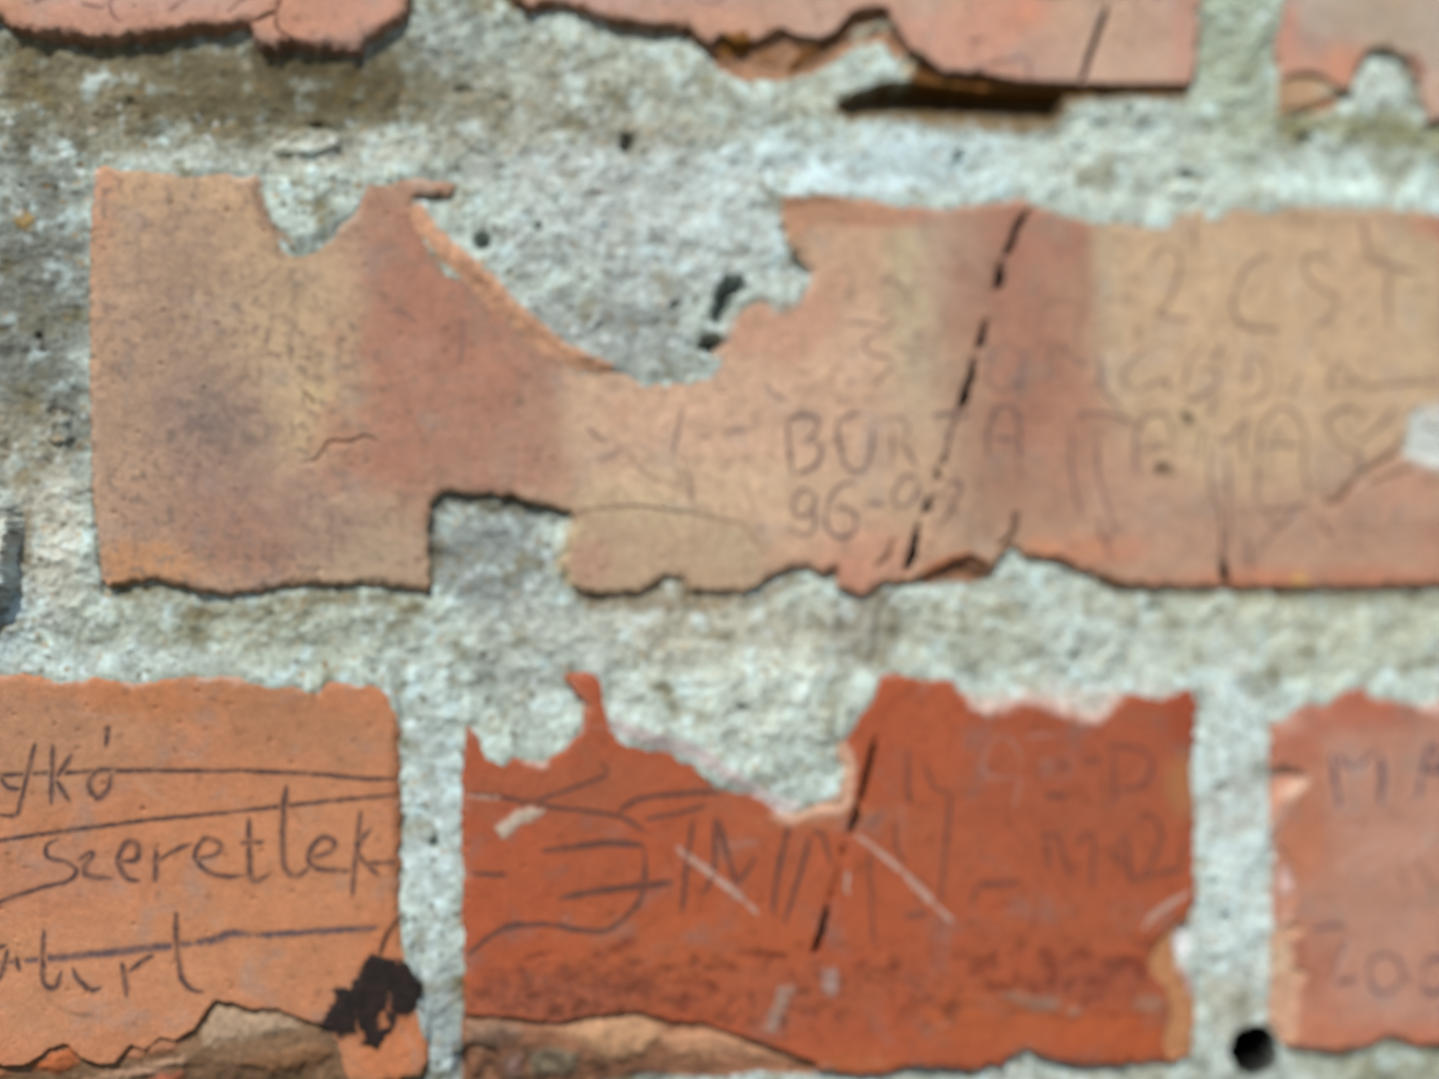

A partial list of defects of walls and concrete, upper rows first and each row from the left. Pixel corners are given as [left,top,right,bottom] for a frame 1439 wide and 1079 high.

spalling [705,5,1103,90]
crack [1079,6,1110,82]
spalling [1275,47,1430,106]
spalling [248,163,364,253]
spalling [404,154,904,380]
crack [990,211,1030,291]
crack [868,323,990,664]
crack [999,516,1021,547]
spalling [608,659,874,828]
crack [811,739,878,954]
spalling [0,998,346,1079]
spalling [524,1014,819,1078]